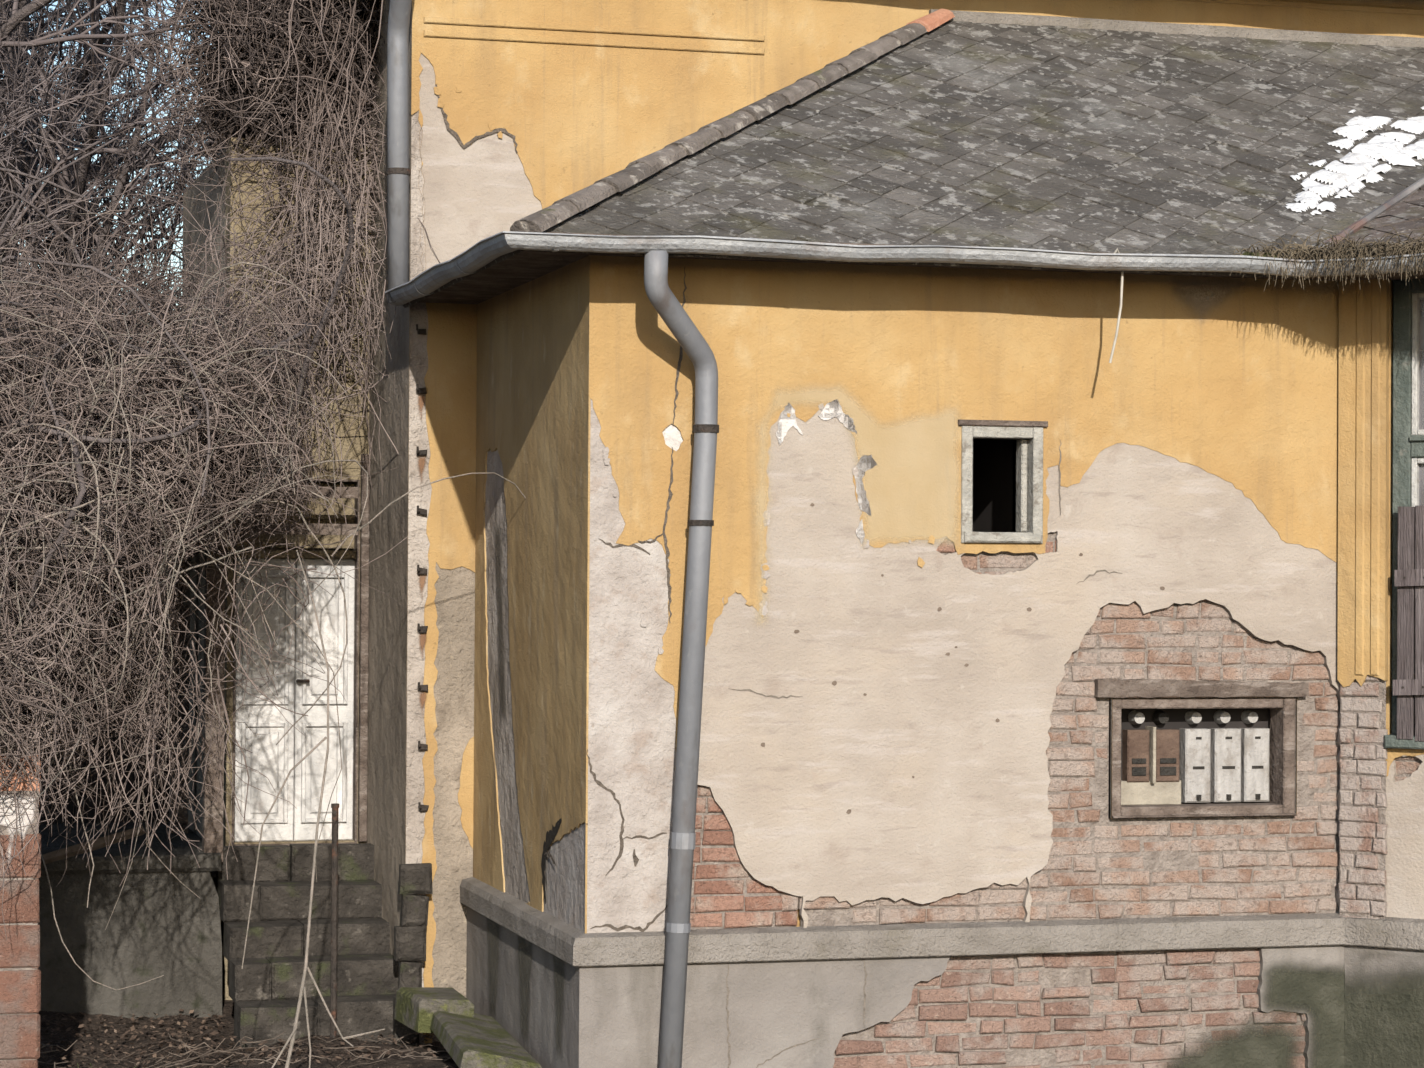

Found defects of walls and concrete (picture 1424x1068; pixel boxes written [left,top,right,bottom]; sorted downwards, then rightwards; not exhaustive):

peeling [410,53,542,280]
crack [680,267,688,307]
crack [600,345,683,622]
spalling [662,424,683,451]
peeling [405,302,676,997]
peeling [690,400,1424,929]
crack [541,818,562,904]
crack [586,749,667,876]
crack [590,904,668,932]
spalling [833,947,1306,1068]